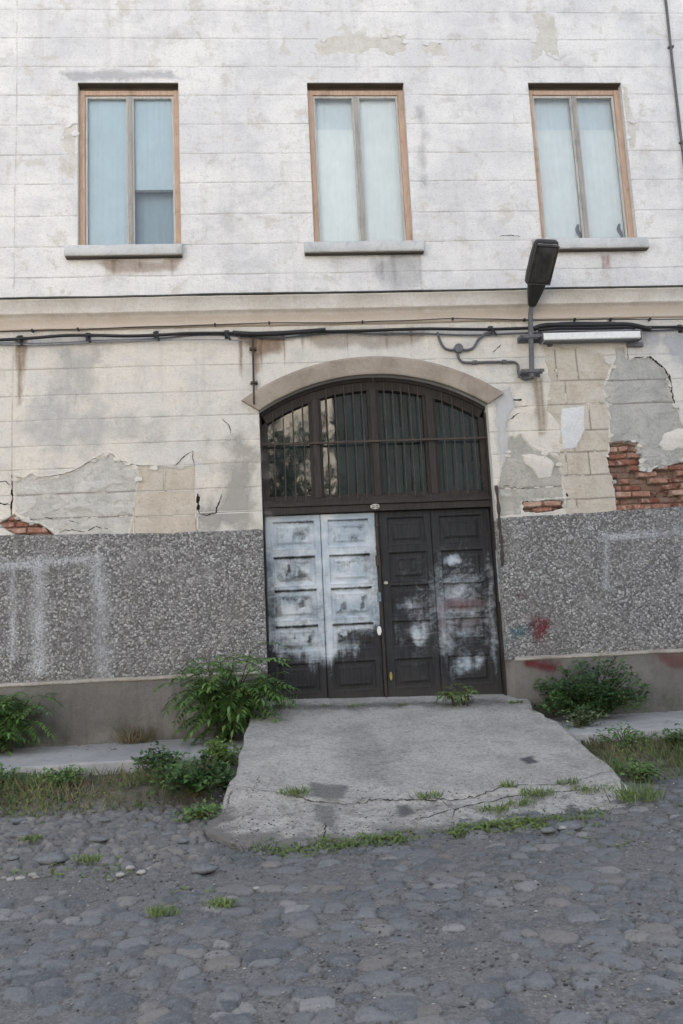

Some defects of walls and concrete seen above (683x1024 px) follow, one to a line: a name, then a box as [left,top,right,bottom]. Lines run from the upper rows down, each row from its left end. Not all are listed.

peeling [314,33,407,56]
peeling [531,12,562,61]
peeling [592,347,683,510]
peeling [0,452,158,535]
crack [0,450,195,532]
peeling [495,435,568,516]
crack [229,772,608,837]